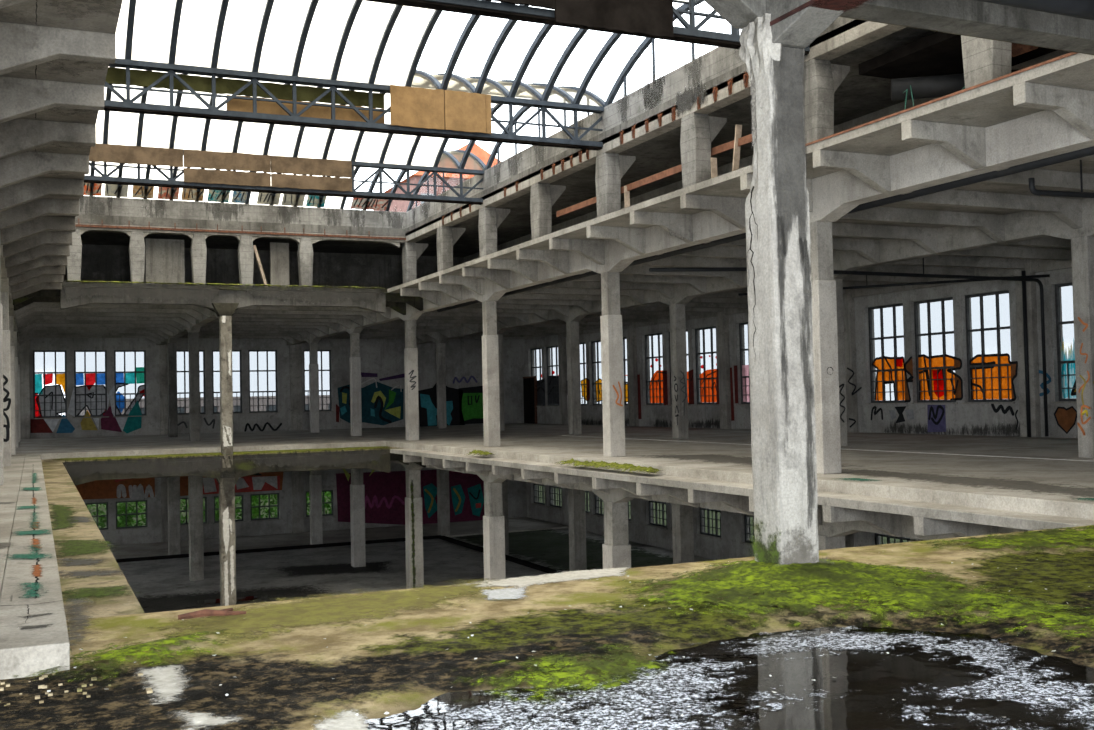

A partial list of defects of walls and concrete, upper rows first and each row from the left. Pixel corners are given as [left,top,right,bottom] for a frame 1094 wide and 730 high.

corrosion [713,73,749,102]
corrosion [620,106,676,145]
crack [747,186,758,356]